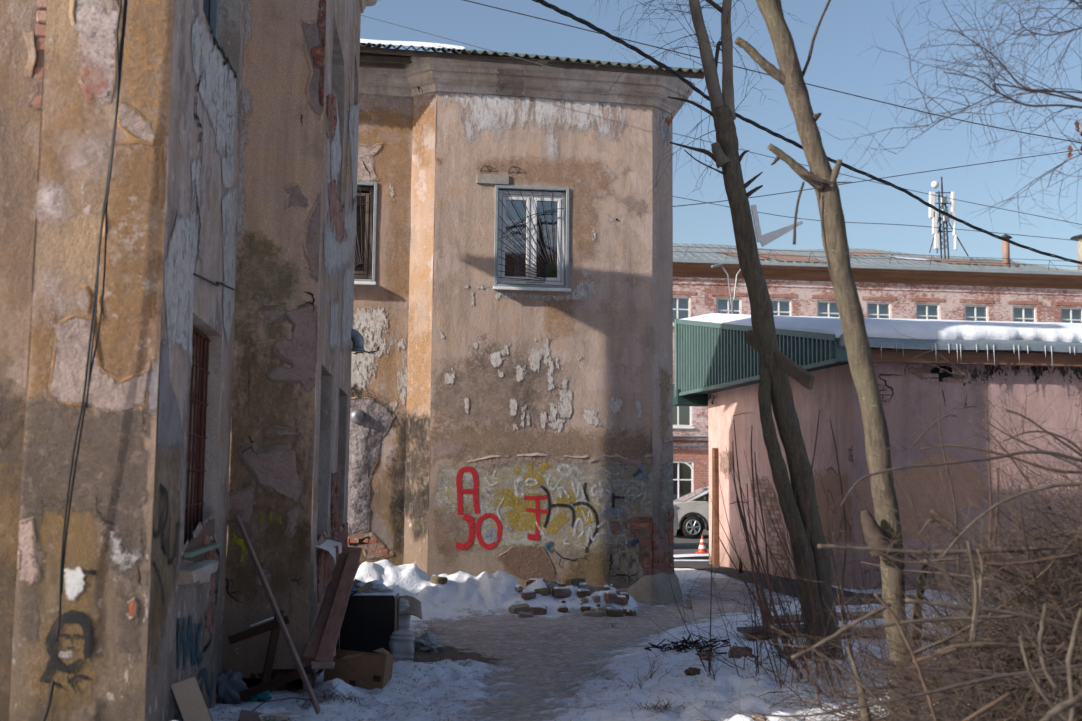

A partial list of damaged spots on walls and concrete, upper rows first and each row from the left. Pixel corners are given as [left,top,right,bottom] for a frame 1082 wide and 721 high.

spalling [24,0,47,111]
peeling [191,15,238,346]
peeling [464,161,609,306]
peeling [444,367,456,385]
peeling [467,337,674,470]
spalling [178,514,216,649]
spalling [237,441,304,538]
water stain [351,384,652,566]
spalling [608,507,674,584]